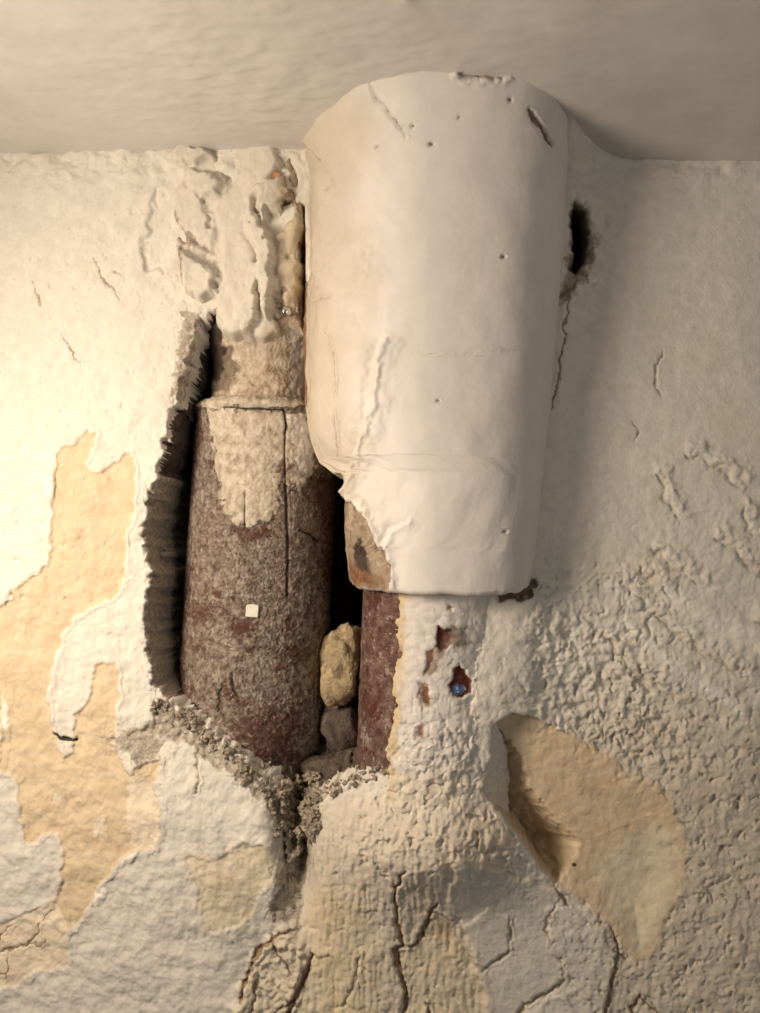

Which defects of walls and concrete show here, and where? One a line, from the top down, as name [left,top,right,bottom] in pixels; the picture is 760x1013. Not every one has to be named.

flaking render [159,300,212,413]
corrosion [234,526,266,542]
corrosion [273,458,336,598]
peeling [343,495,399,593]
peeling [0,421,319,995]
corrosion [230,701,308,764]
corrosion [408,597,476,753]
flaking render [479,708,706,979]
crack [235,928,316,1013]
crack [388,870,442,1013]
crack [480,872,574,1013]
crack [602,923,661,1013]